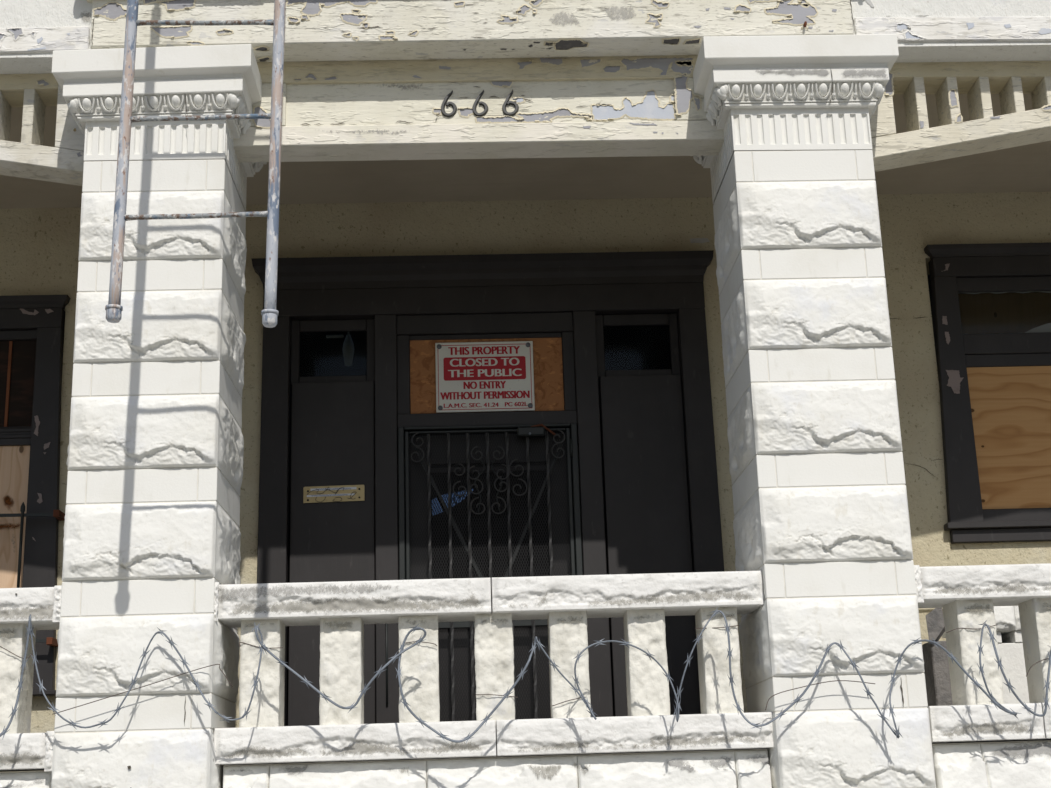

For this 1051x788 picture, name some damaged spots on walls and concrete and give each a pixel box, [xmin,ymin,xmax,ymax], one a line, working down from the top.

peeling [0,27,46,51]
peeling [254,45,271,62]
peeling [286,0,378,42]
peeling [378,30,419,41]
peeling [458,0,702,134]
peeling [724,0,819,29]